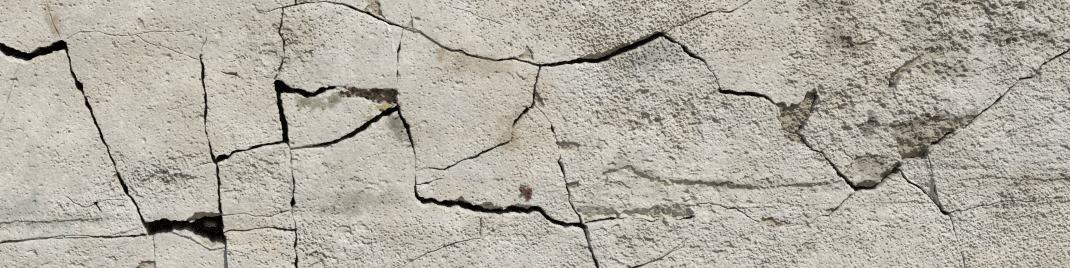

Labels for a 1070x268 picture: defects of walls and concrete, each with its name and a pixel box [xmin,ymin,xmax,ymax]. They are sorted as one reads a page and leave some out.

crack [0,0,775,268]
spalling [775,91,818,145]
spalling [856,114,978,190]
crack [783,49,1070,268]